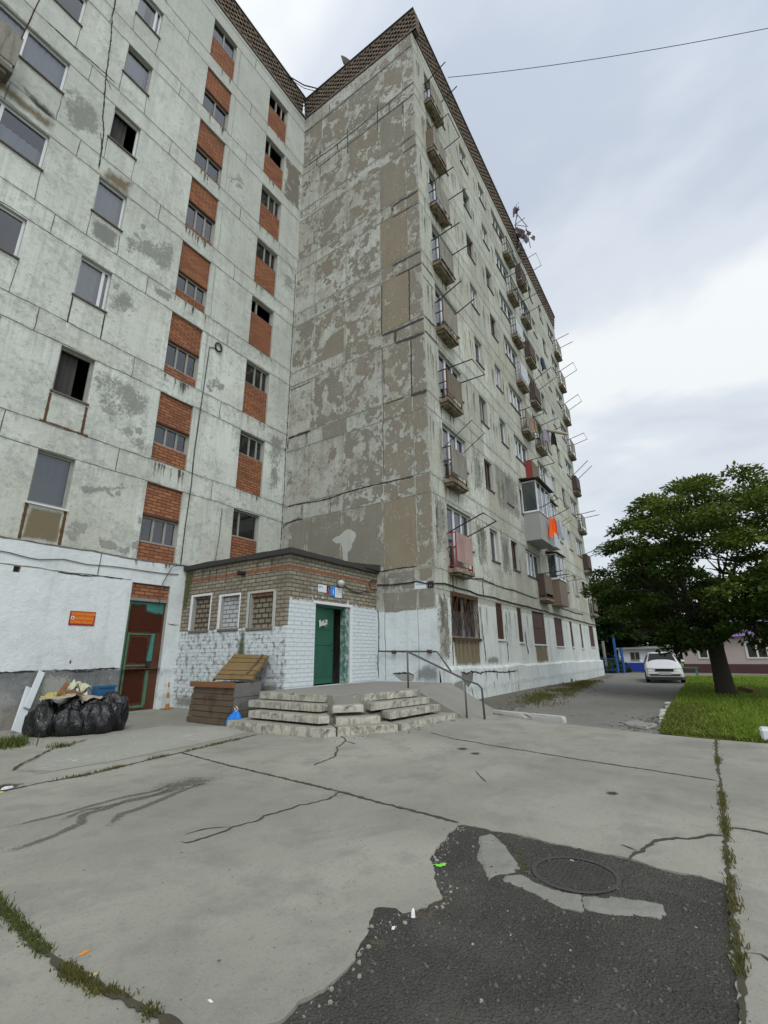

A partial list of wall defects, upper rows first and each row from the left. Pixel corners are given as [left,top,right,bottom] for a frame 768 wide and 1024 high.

peeling [271,34,451,660]
crack [313,736,355,766]
crack [181,792,339,843]
crack [622,834,725,859]
spalling [477,834,667,920]